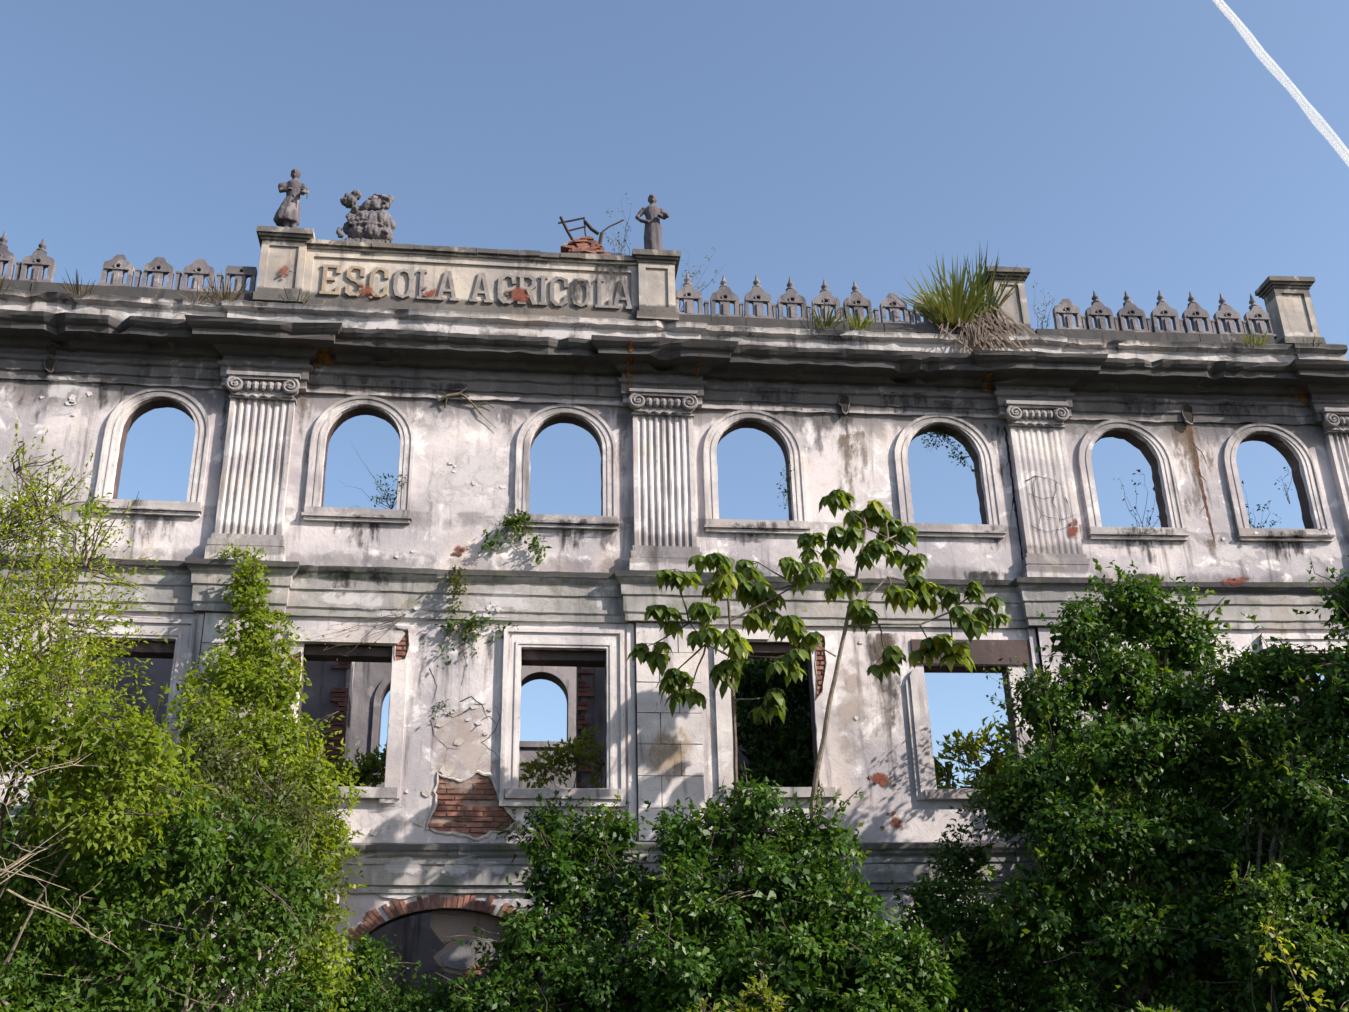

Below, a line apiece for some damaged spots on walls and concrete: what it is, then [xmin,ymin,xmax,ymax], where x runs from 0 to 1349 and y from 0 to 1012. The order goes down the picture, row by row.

water stain [750,386,867,504]
water stain [880,392,1003,445]
crack [1003,427,1074,561]
rust [1173,425,1213,513]
water stain [854,633,905,724]
flaking render [358,765,522,843]
flaking render [868,773,896,787]
flaking render [880,811,903,830]
flaking render [383,856,505,876]
flaking render [344,893,542,943]
flaking render [441,937,514,981]